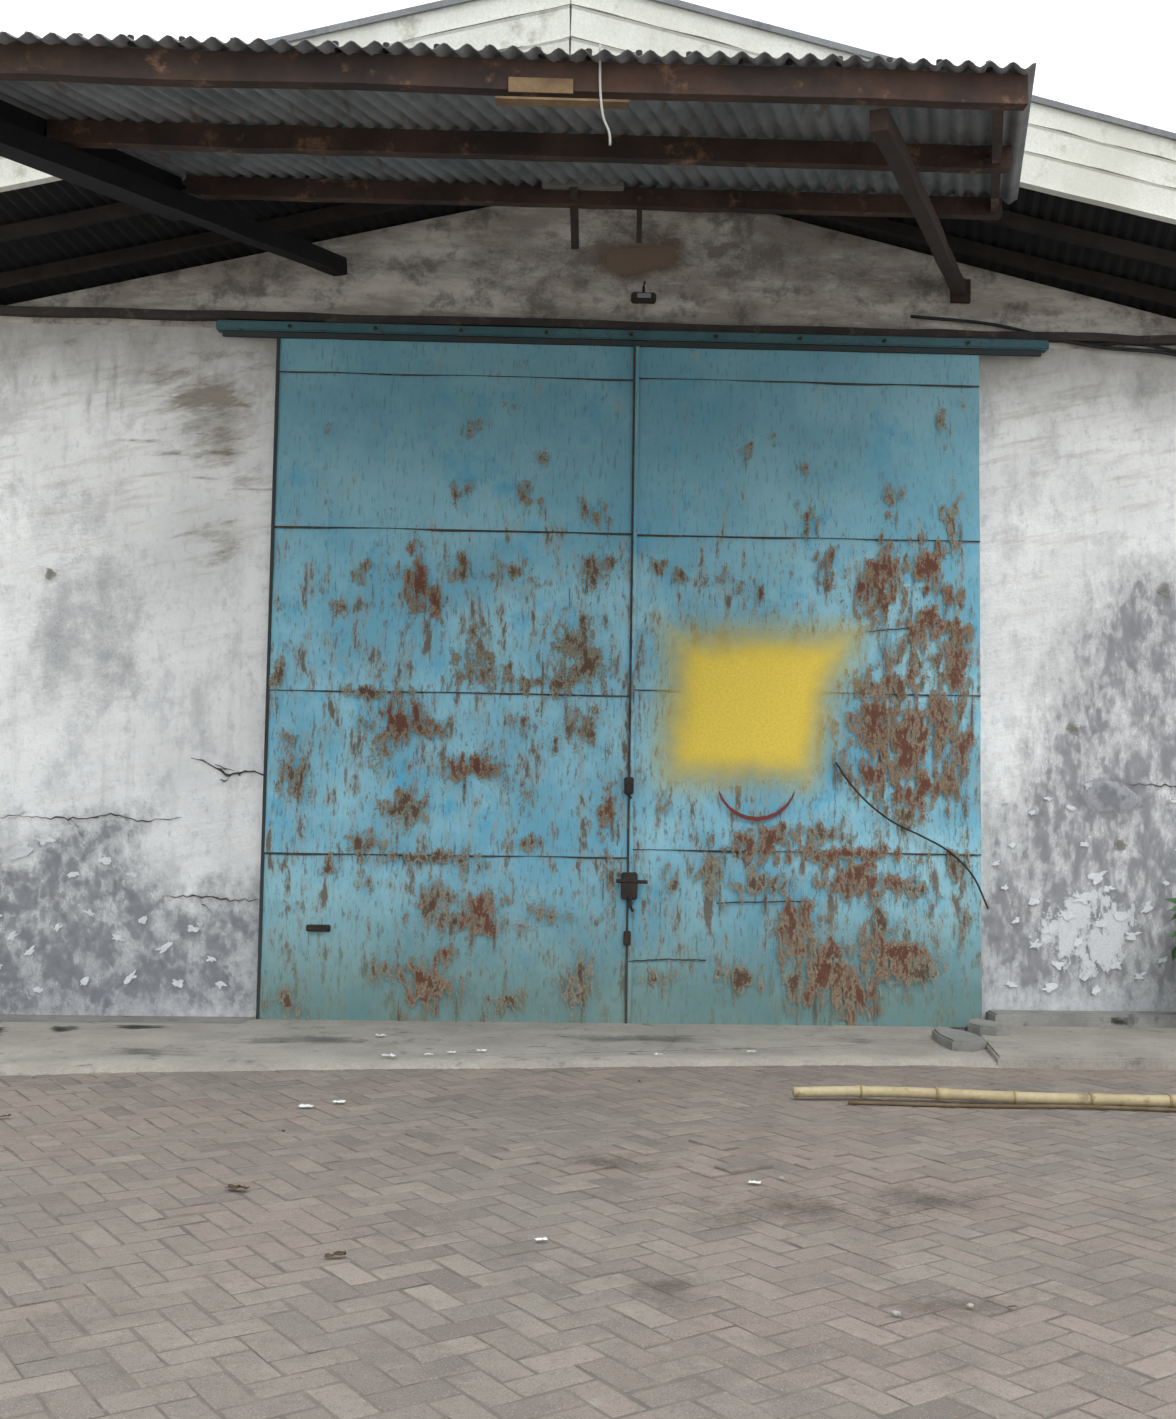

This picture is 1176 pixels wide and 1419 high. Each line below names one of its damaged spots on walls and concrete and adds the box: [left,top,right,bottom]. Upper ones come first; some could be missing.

crack [4,813,181,840]
crack [192,758,263,782]
corrosion [269,646,312,813]
corrosion [321,498,635,1023]
corrosion [647,475,979,1026]
leakage [981,574,1176,1007]
crack [1119,781,1176,789]
leakage [0,817,259,1016]
crack [167,894,259,913]
peeling [1011,871,1168,996]
corrosion [260,979,312,1020]